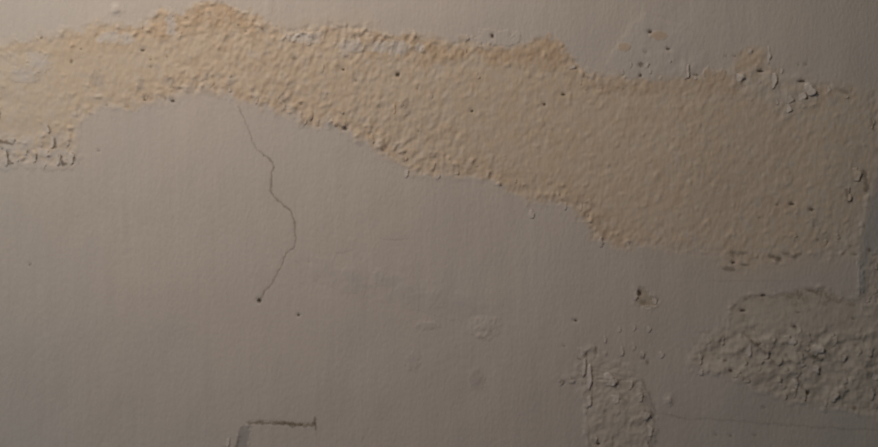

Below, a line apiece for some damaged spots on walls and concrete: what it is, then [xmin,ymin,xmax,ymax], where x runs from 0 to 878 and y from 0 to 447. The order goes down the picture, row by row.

peeling [0,124,84,172]